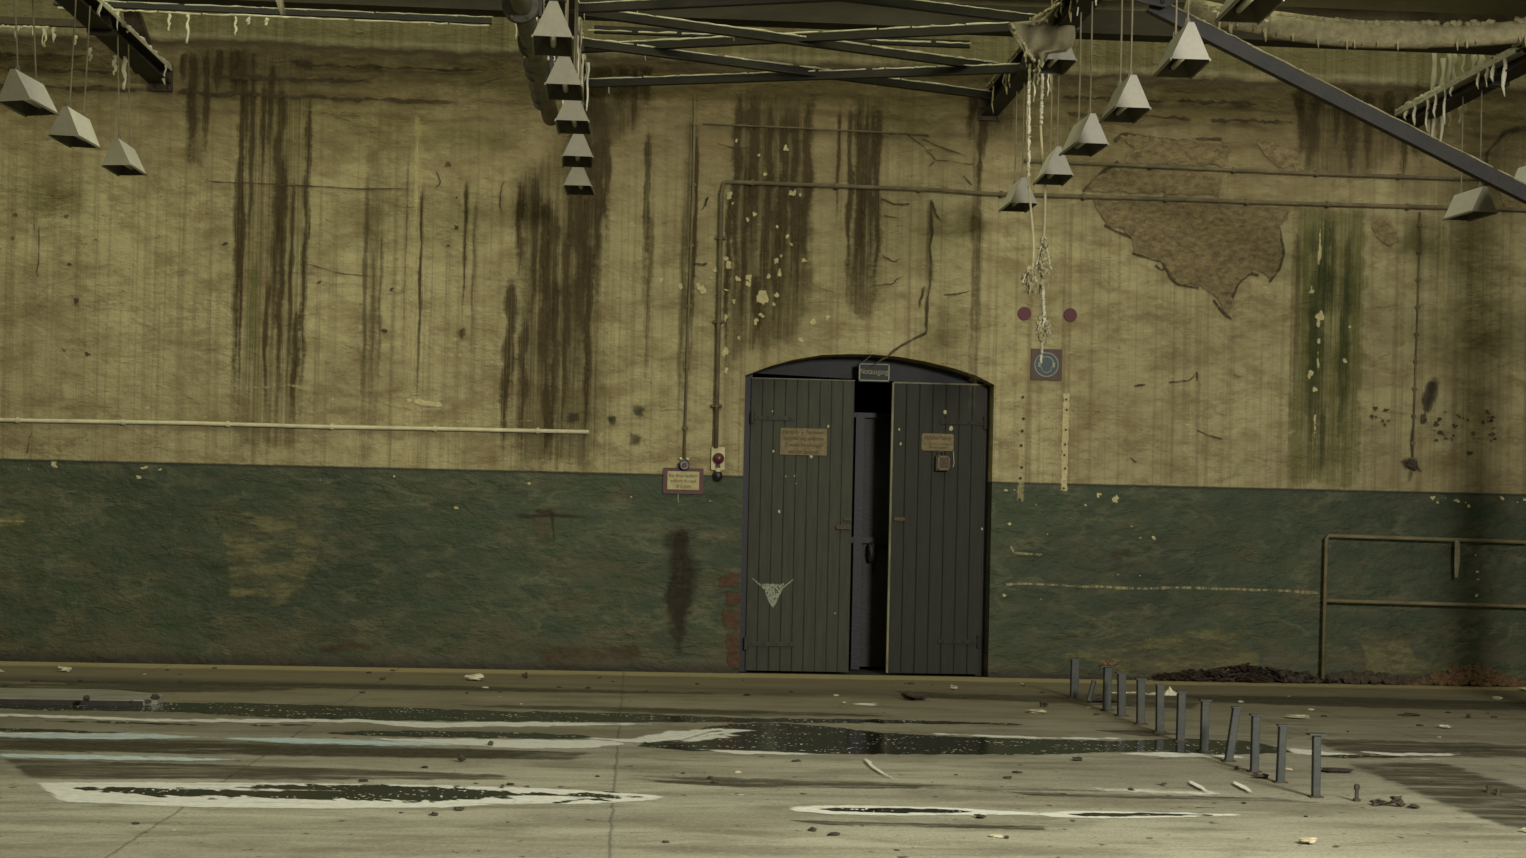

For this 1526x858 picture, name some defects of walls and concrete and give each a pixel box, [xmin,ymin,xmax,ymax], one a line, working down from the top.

spalling [1113,132,1230,167]
spalling [1094,200,1291,319]
damp [1296,226,1361,464]
damp [667,532,694,631]